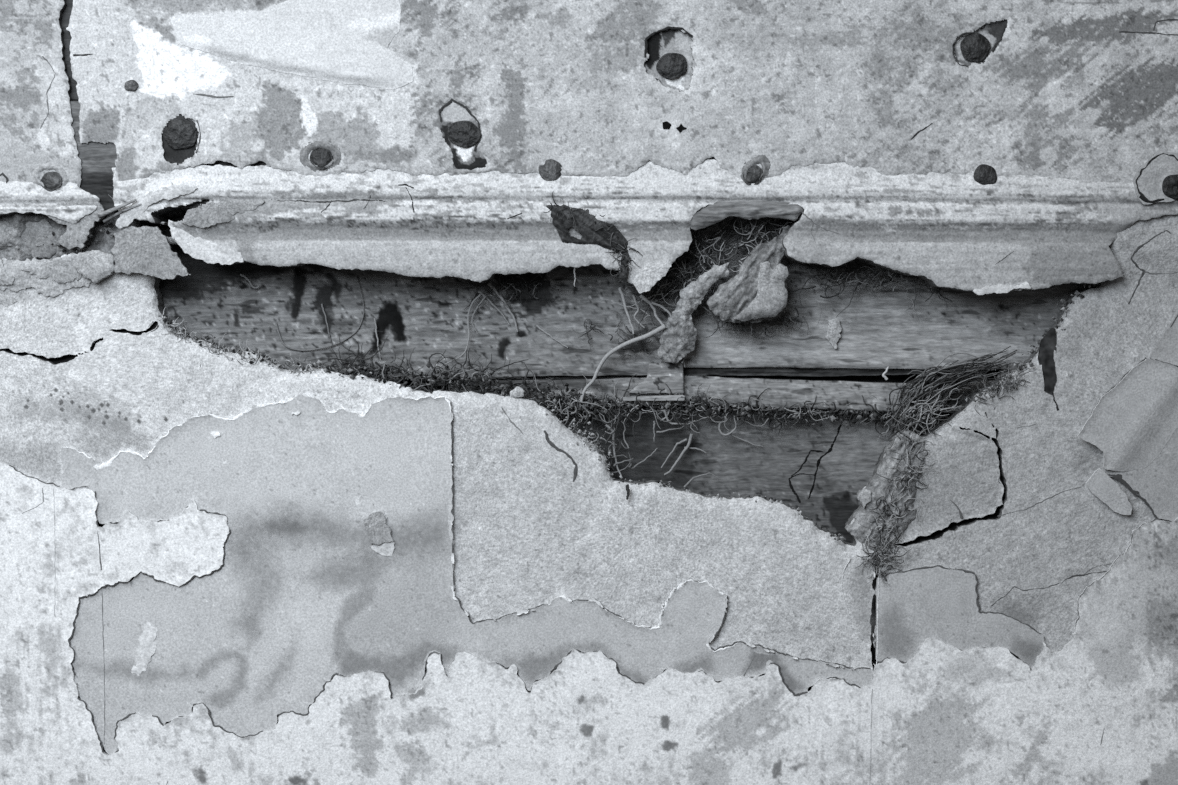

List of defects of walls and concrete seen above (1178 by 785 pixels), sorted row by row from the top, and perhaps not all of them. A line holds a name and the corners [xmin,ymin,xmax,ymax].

crack [1128,230,1177,304]
crack [0,321,158,364]
peeling [0,150,1178,754]
crack [895,412,1081,547]
crack [841,558,879,726]